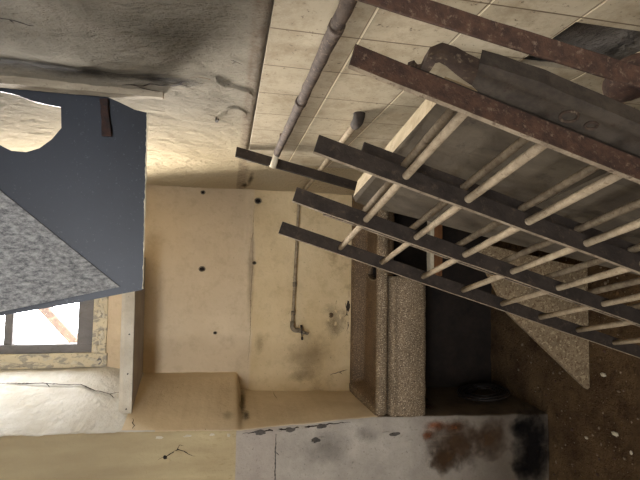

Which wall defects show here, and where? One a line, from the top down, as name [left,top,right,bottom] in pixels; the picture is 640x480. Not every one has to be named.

rust [356,0,640,102]
crack [2,383,119,398]
crack [158,445,192,463]
water stain [432,423,502,470]
water stain [512,413,550,480]